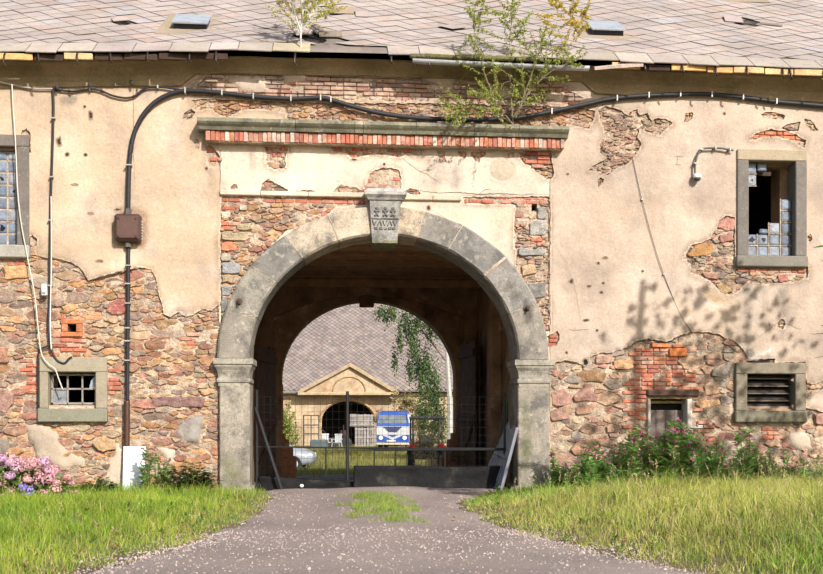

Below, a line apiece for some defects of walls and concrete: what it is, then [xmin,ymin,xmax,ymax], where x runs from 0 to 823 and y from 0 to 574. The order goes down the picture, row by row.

spalling [184,74,672,186]
spalling [749,112,818,147]
spalling [0,146,420,490]
spalling [463,196,559,347]
spalling [683,216,807,294]
spalling [549,332,823,484]